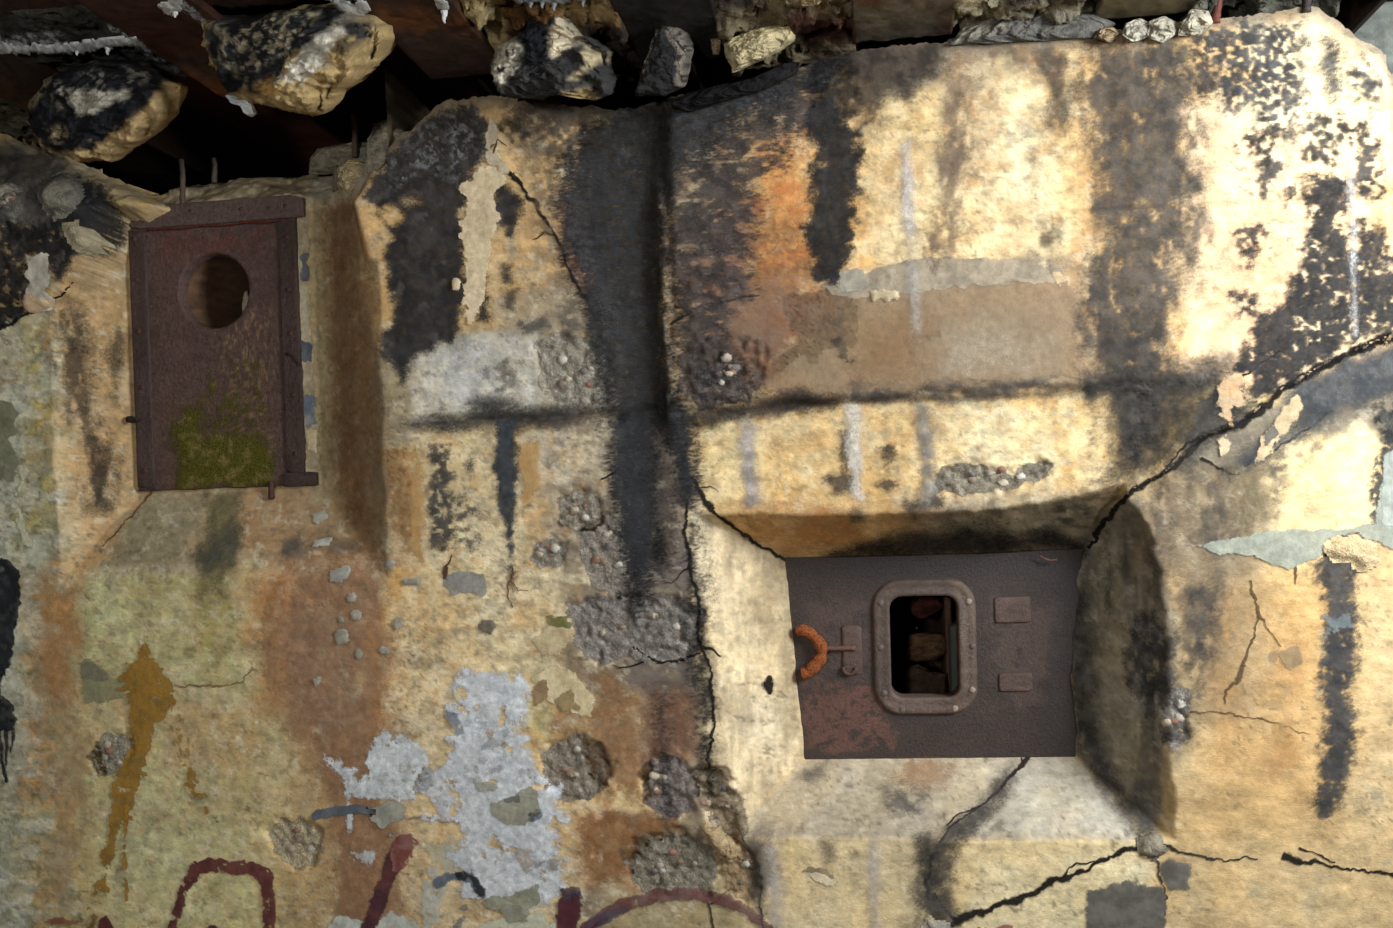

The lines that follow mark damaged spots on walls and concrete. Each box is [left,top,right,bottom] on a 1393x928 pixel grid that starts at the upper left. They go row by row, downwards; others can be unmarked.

water stain [0,147,130,327]
crack [493,139,603,343]
crack [670,295,760,325]
water stain [362,14,1393,823]
crack [1087,331,1393,549]
crack [613,474,785,770]
peeling [350,851,375,865]
peeling [368,800,406,829]
crack [701,838,764,928]
crack [941,757,1030,841]
crack [924,844,1393,927]